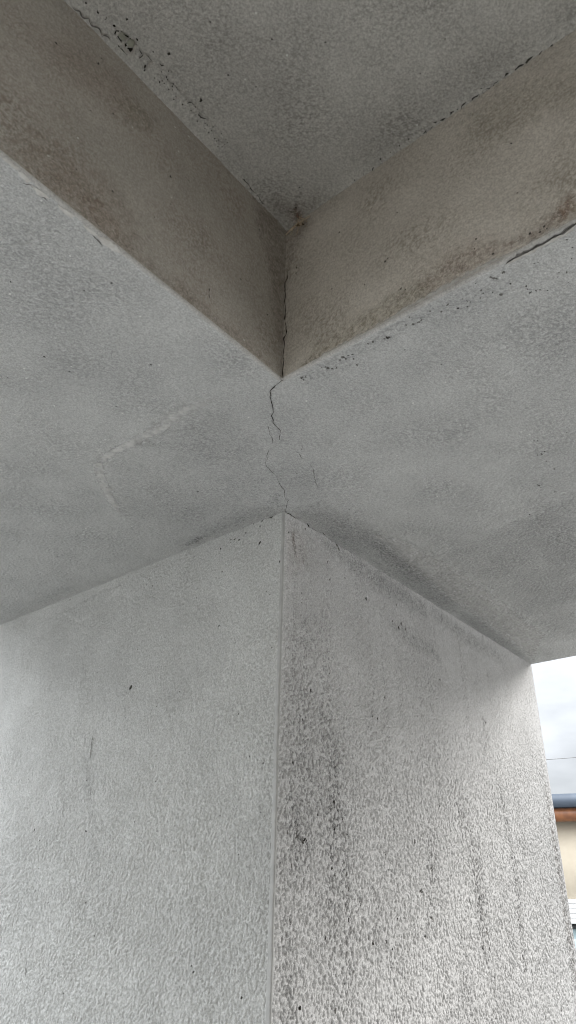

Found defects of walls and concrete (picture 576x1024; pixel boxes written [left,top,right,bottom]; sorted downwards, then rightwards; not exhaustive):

crack [265,276,325,535]